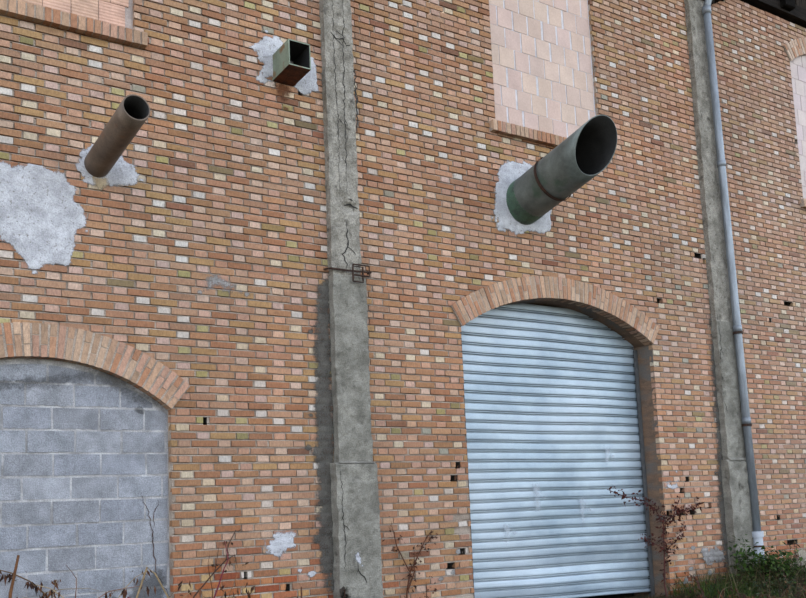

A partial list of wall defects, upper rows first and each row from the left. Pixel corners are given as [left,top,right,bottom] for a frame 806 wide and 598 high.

crack [331,0,358,268]
crack [142,496,170,597]